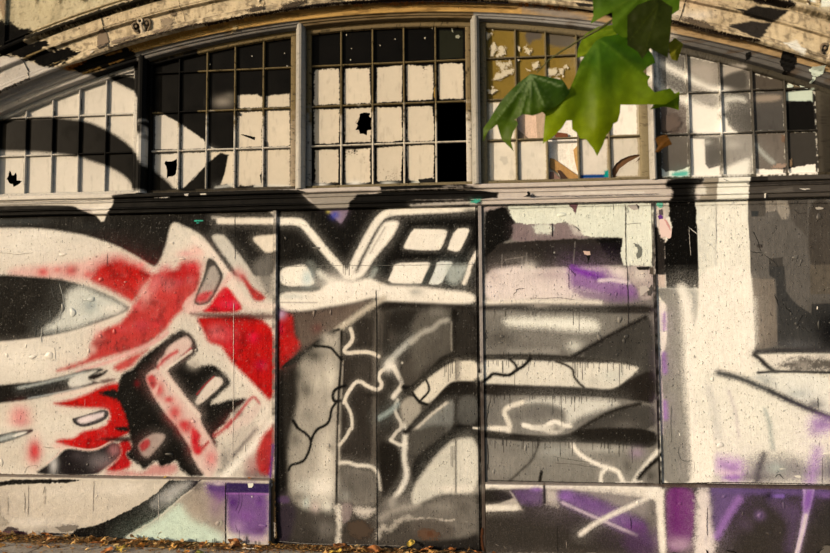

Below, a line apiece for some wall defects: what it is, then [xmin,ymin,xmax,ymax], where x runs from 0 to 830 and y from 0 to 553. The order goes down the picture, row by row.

spalling [90,29,109,53]
peeling [486,29,569,94]
crack [278,292,396,546]